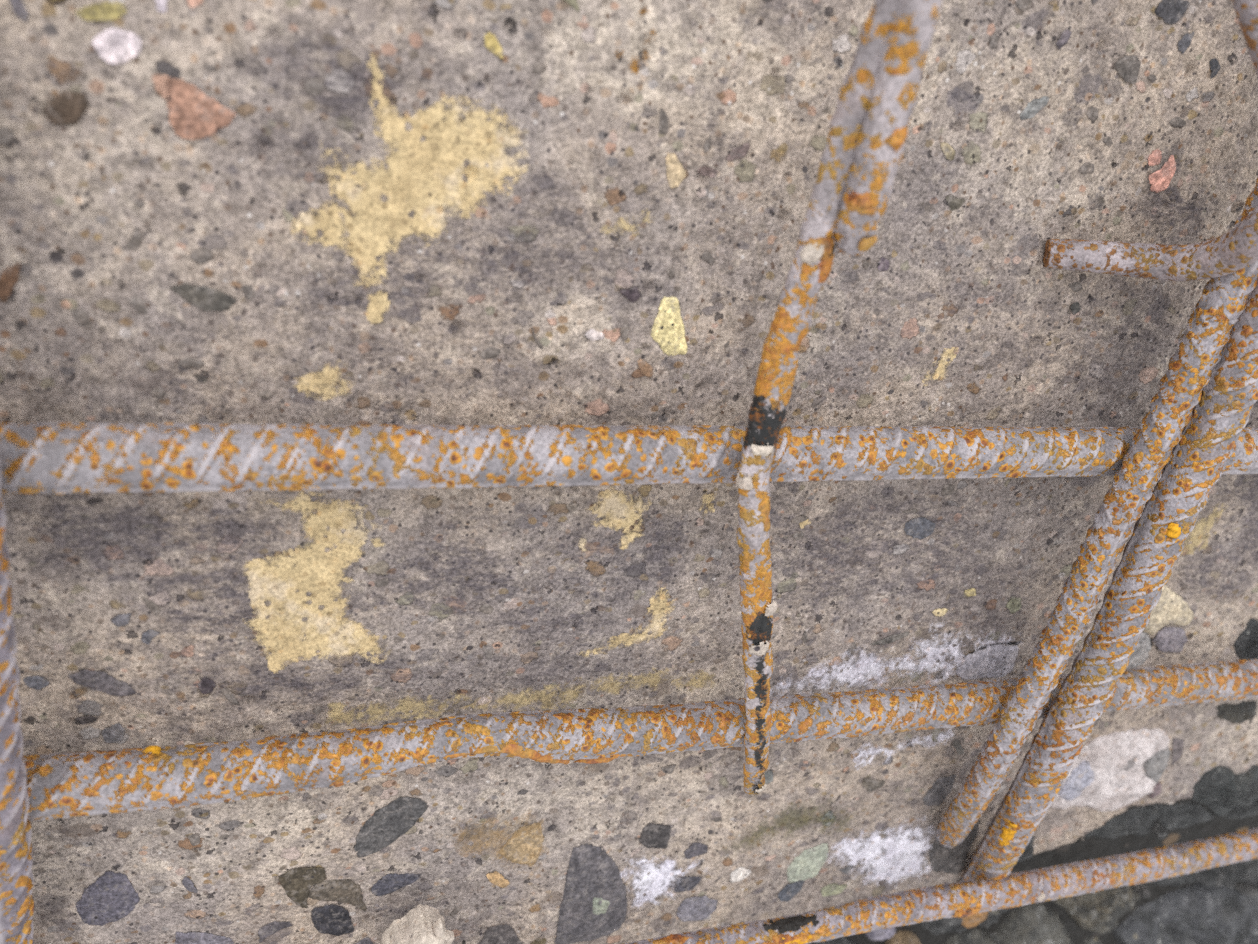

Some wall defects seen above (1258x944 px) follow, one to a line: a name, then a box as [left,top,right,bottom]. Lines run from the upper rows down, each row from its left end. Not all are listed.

corrosion [888,127,908,152]
peeling [291,54,527,324]
corrosion [843,189,876,216]
corrosion [808,237,834,283]
peeling [244,492,390,674]
spalling [1233,618,1258,660]
spalling [1216,700,1257,724]
corrosion [418,744,620,765]
spalling [1010,728,1258,873]
spalling [809,858,1258,944]
corrosion [650,934,692,944]
corrosion [763,932,821,944]